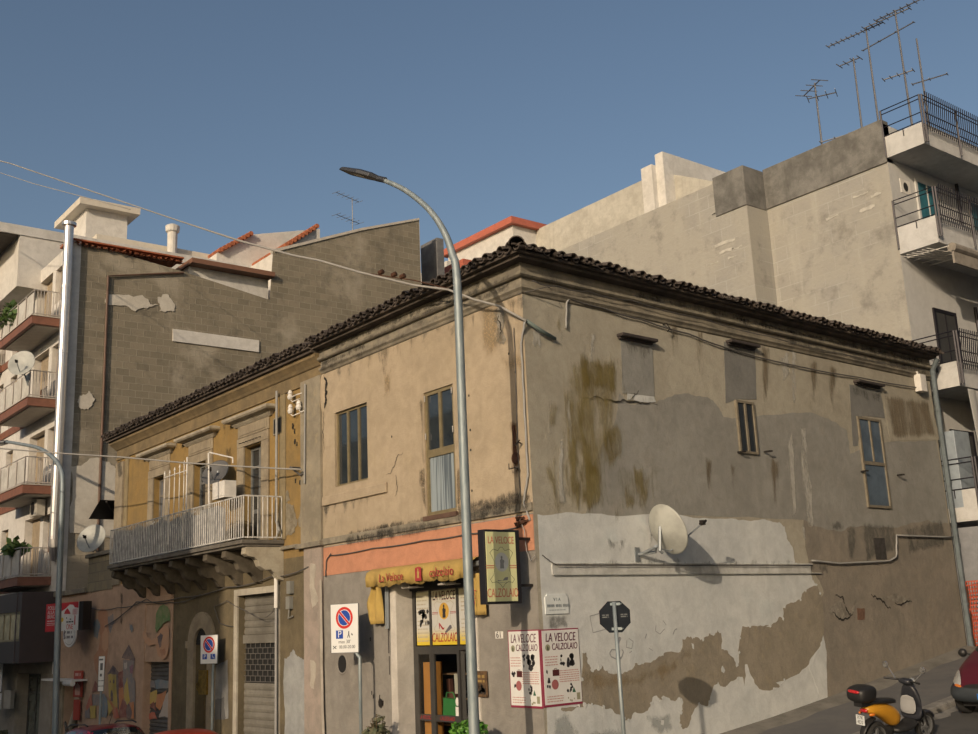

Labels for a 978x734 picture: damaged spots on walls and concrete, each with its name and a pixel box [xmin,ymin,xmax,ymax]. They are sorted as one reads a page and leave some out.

peeling [105,294,175,312]
peeling [77,391,95,410]
peeling [69,457,116,538]
peeling [561,586,865,729]